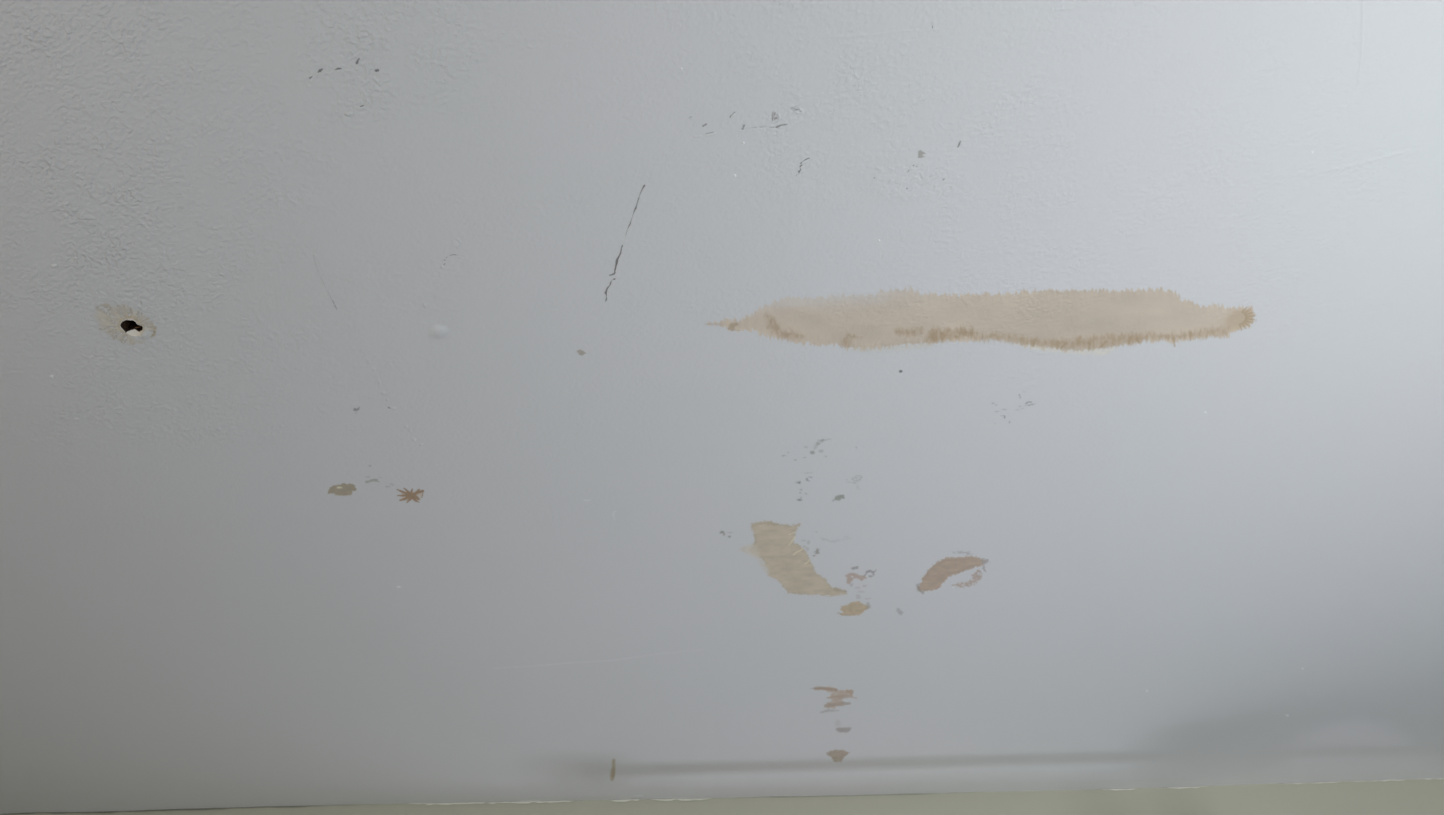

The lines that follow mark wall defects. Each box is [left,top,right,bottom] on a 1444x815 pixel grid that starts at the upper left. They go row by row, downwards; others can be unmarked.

damp [703,285,1258,358]
peeling [737,519,872,617]
peeling [915,549,992,595]